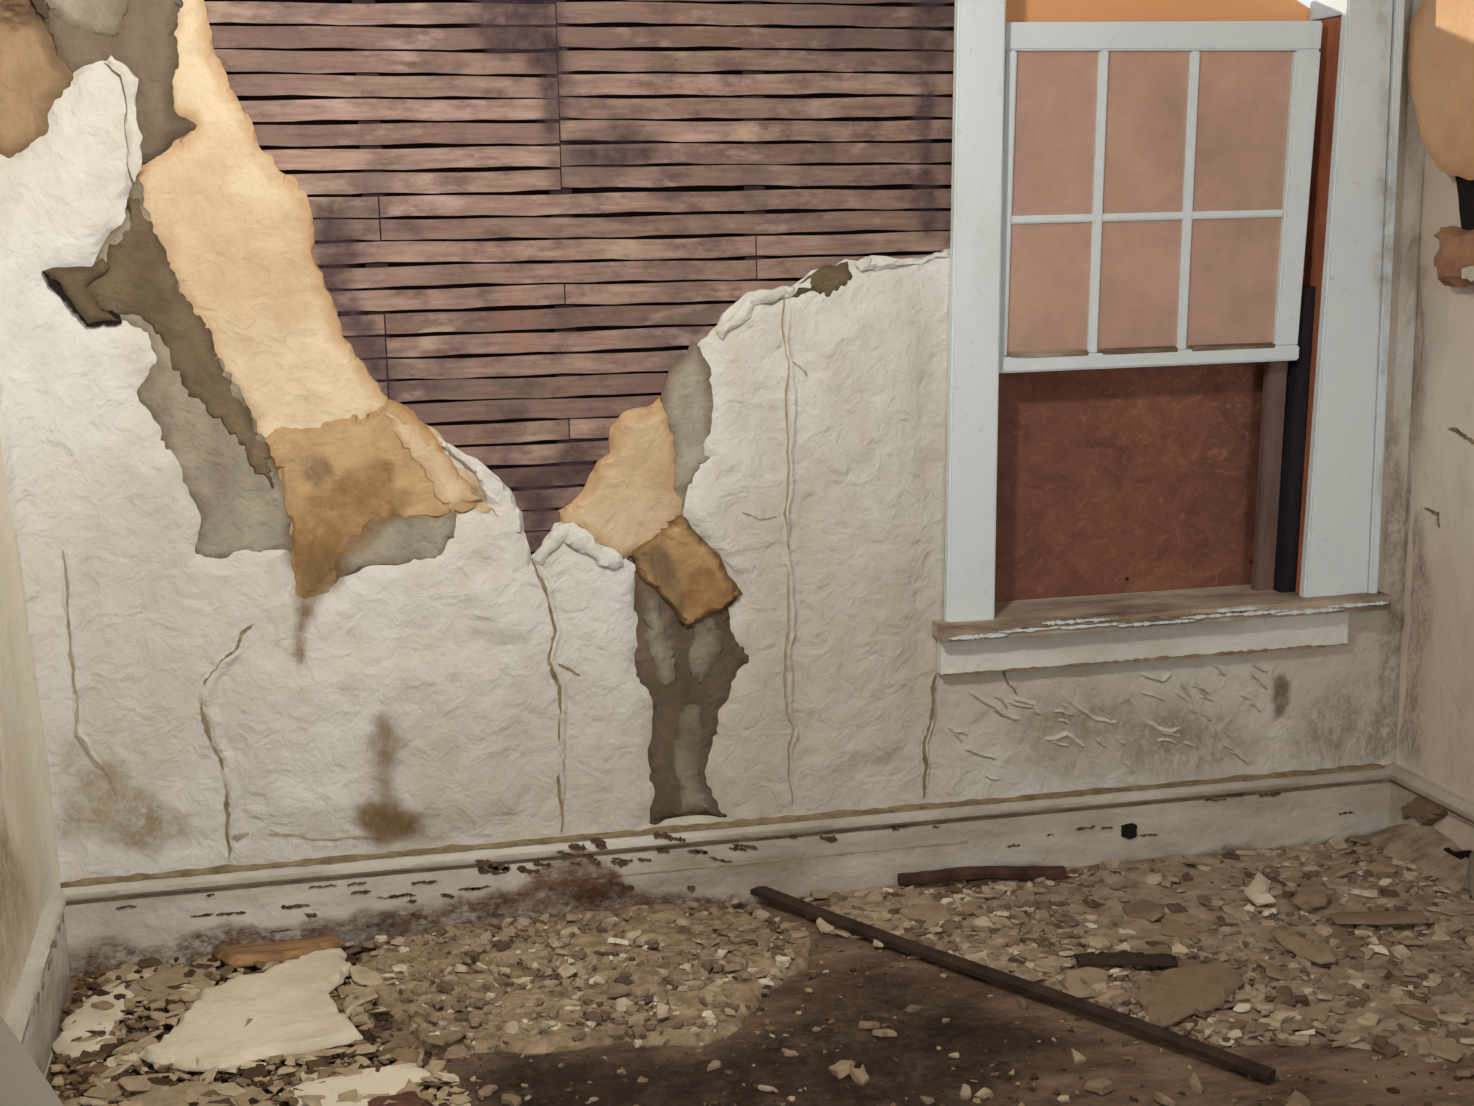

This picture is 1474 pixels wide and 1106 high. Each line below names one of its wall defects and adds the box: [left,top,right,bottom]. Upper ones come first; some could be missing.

peeling [1408,0,1474,287]
spalling [0,0,524,598]
peeling [716,251,948,340]
peeling [190,893,246,917]
crack [198,624,382,859]
spalling [281,341,758,920]
crack [532,558,580,832]
crack [742,297,808,806]
peeling [1205,792,1281,801]